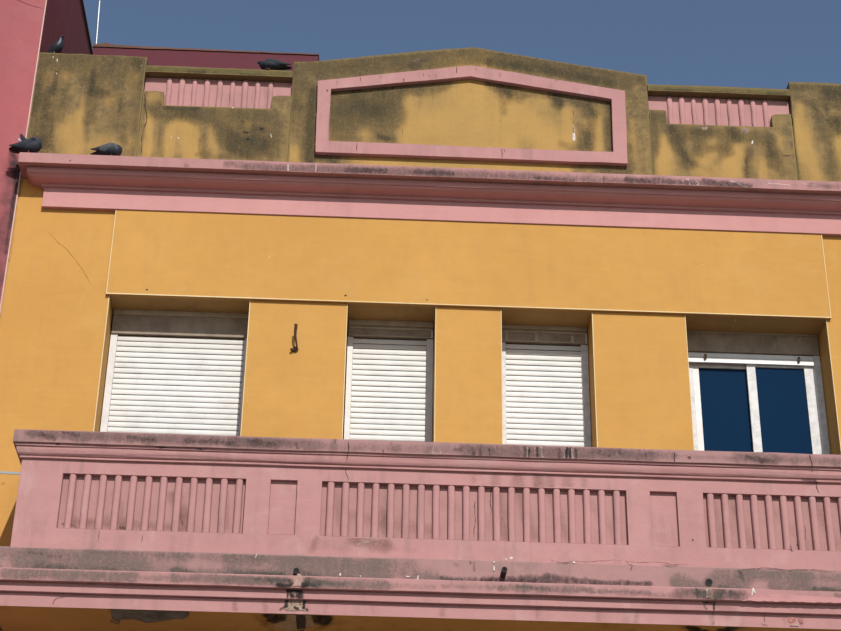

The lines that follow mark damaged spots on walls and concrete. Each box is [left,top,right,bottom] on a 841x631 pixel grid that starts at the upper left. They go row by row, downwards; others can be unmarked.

leakage [34,48,841,166]
leakage [623,169,752,187]
leakage [9,153,20,229]
leakage [12,547,151,571]
leakage [158,552,391,625]
leakage [402,573,652,593]
leakage [671,569,841,610]
spalling [107,609,193,625]
leakage [684,622,739,631]